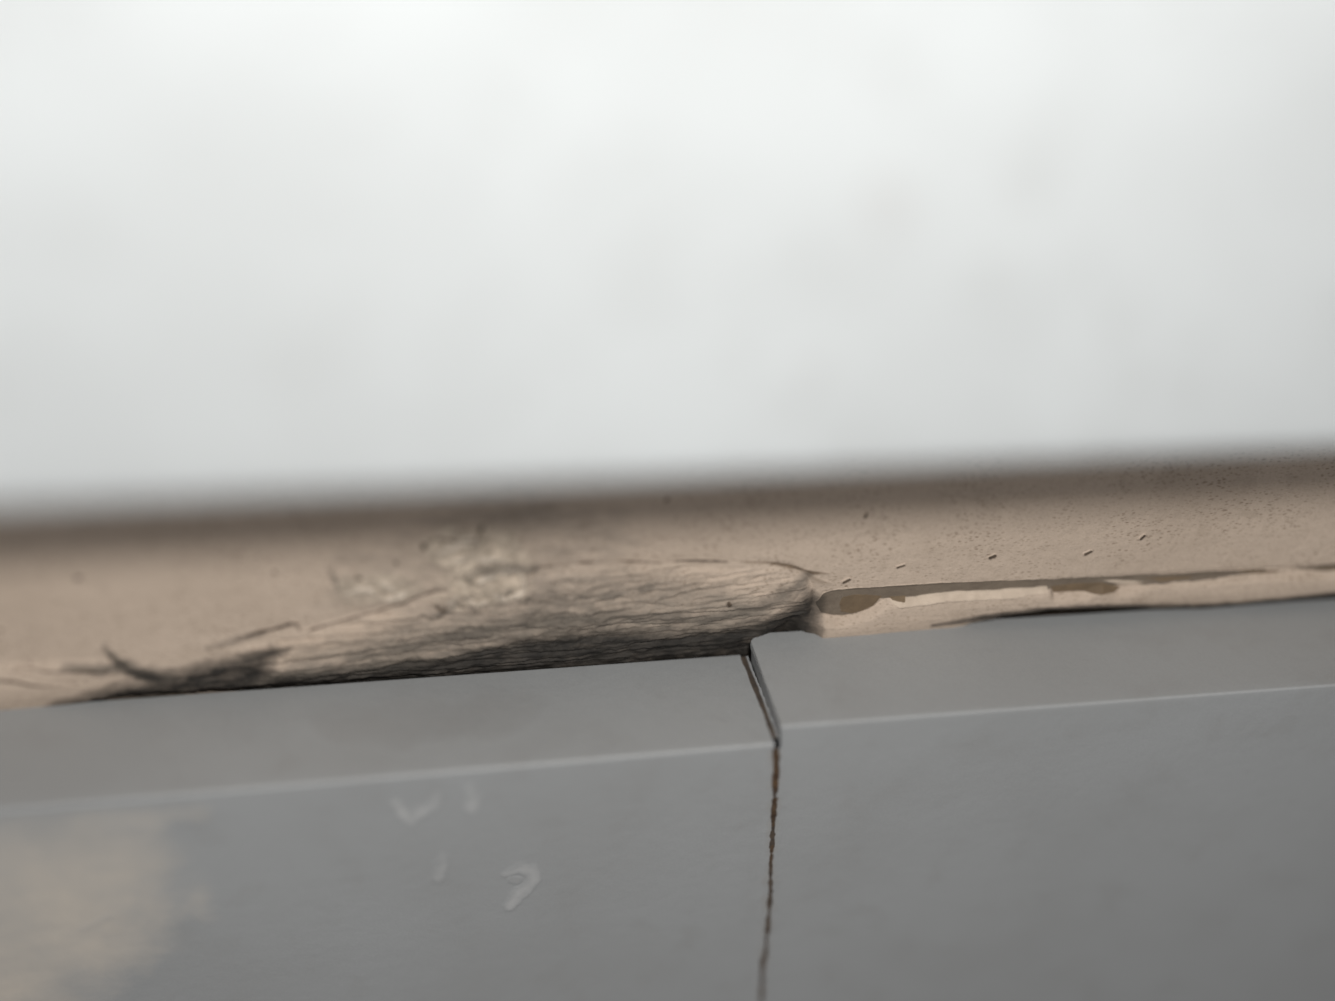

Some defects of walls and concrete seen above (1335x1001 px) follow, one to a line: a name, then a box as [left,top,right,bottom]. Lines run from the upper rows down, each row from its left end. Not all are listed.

peeling [814,562,1335,617]
crack [739,656,779,749]